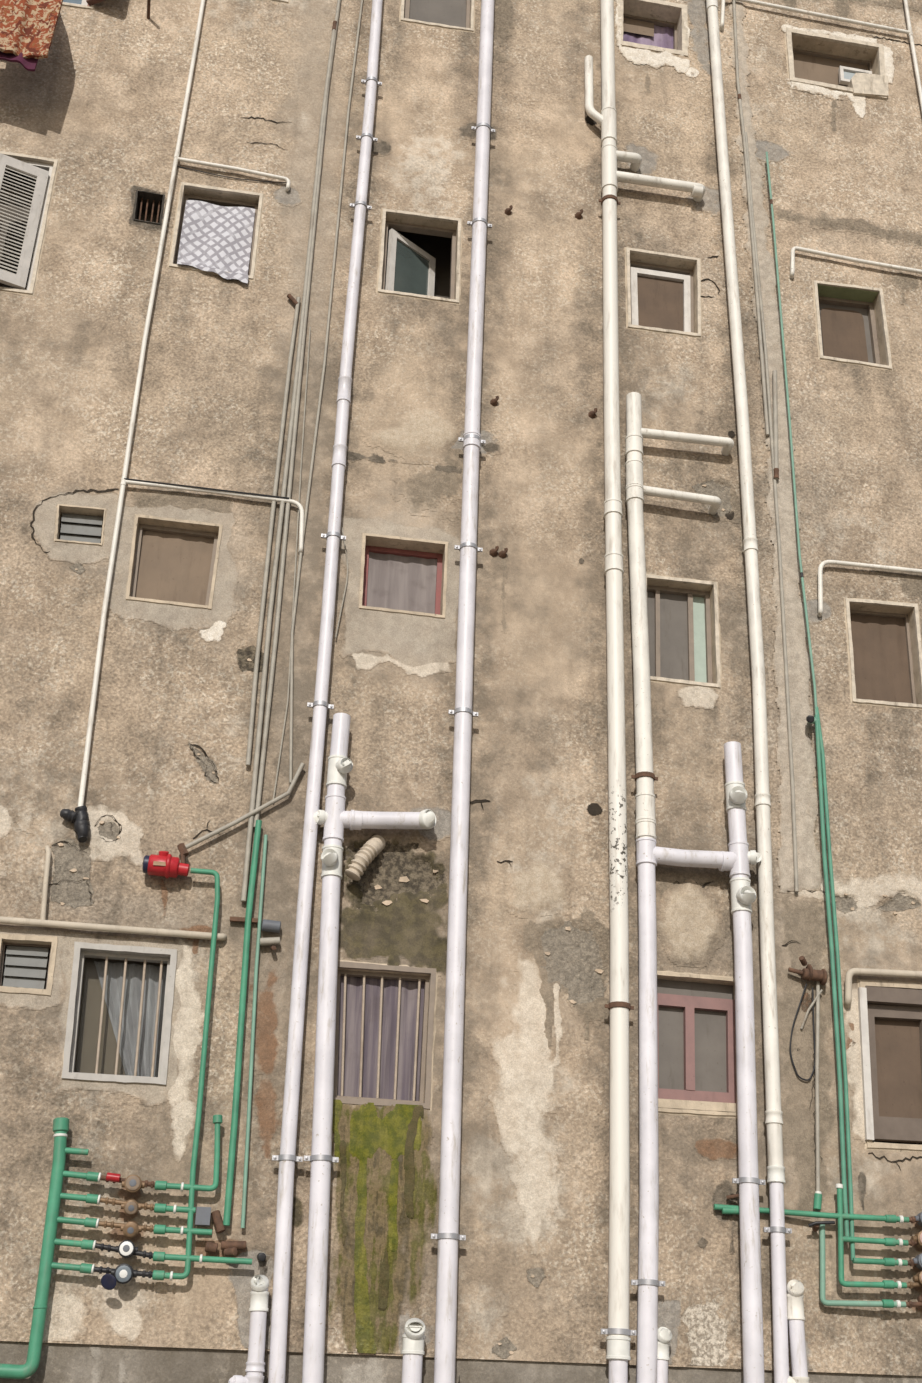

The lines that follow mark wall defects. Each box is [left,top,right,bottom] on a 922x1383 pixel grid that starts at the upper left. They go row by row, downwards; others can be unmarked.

crack [30,488,119,553]
spalling [198,621,264,673]
flaking render [351,652,453,678]
spalling [188,743,219,784]